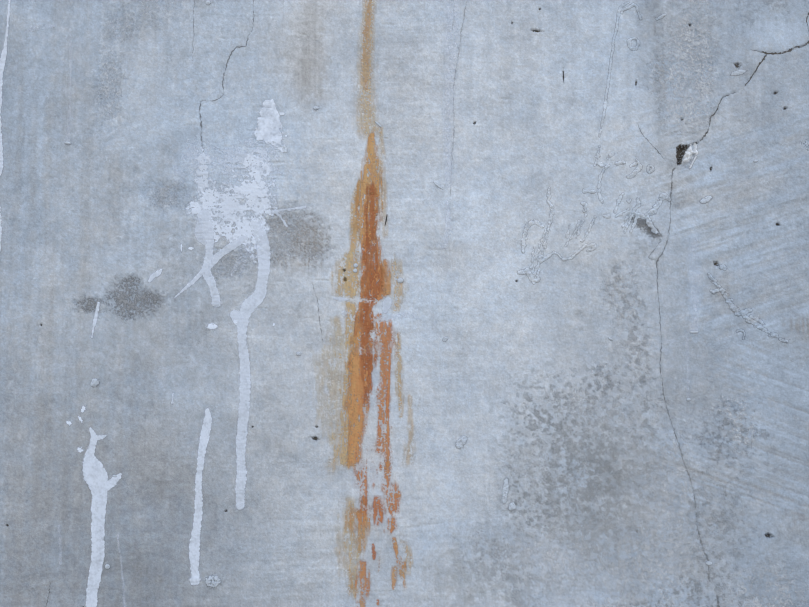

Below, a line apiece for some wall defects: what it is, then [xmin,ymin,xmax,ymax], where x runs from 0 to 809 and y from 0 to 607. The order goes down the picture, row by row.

crack [745,13,809,86]
hole [676,142,698,169]
corrosion [332,2,406,607]